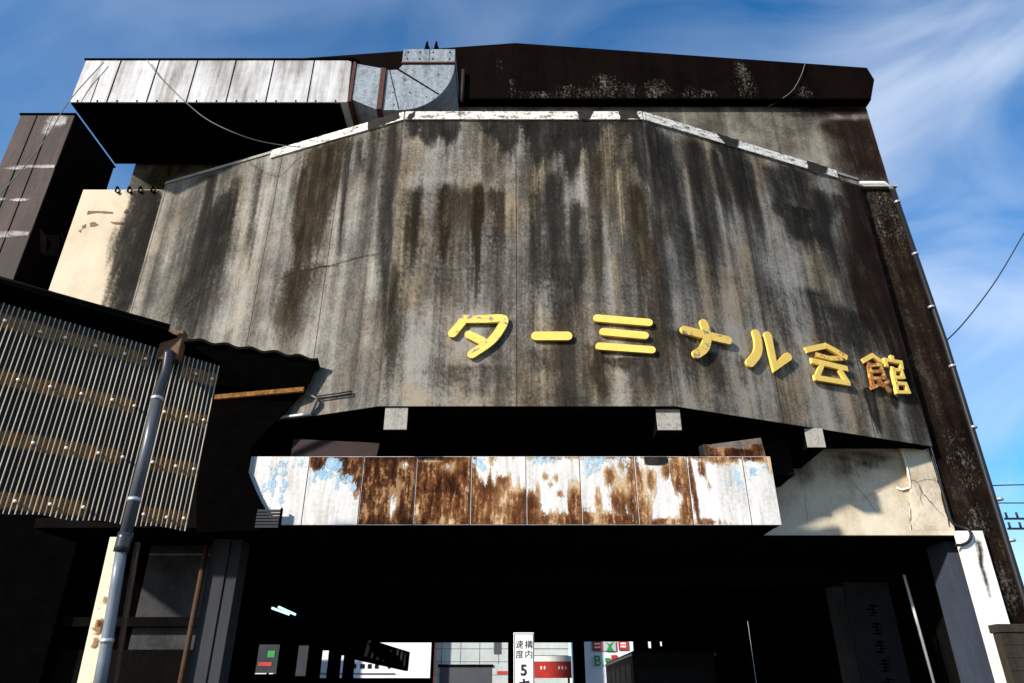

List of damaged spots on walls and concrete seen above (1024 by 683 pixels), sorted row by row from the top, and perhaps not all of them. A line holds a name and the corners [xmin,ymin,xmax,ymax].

leakage [102,164,187,313]
leakage [170,164,260,339]
leakage [269,120,512,378]
leakage [478,107,931,441]
corrosion [309,444,772,524]
crack [914,473,949,525]
leakage [975,540,989,592]